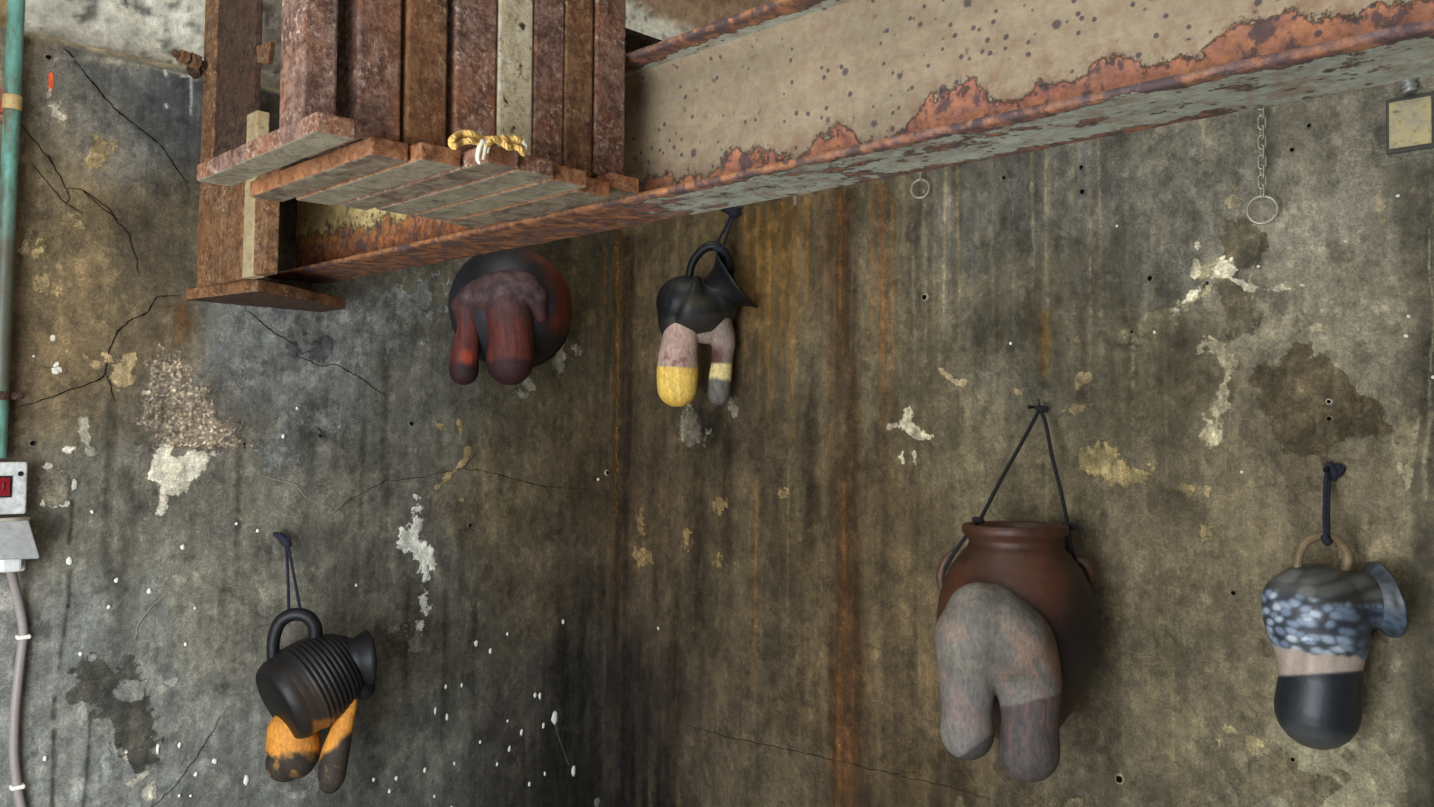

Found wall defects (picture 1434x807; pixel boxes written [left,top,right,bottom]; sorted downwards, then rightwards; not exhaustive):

crack [63,48,184,179]
crack [17,123,179,408]
peeling [84,267,452,516]
leakage [511,237,678,807]
peeling [887,405,934,466]
peeling [1075,440,1156,490]
peeling [1179,482,1212,498]